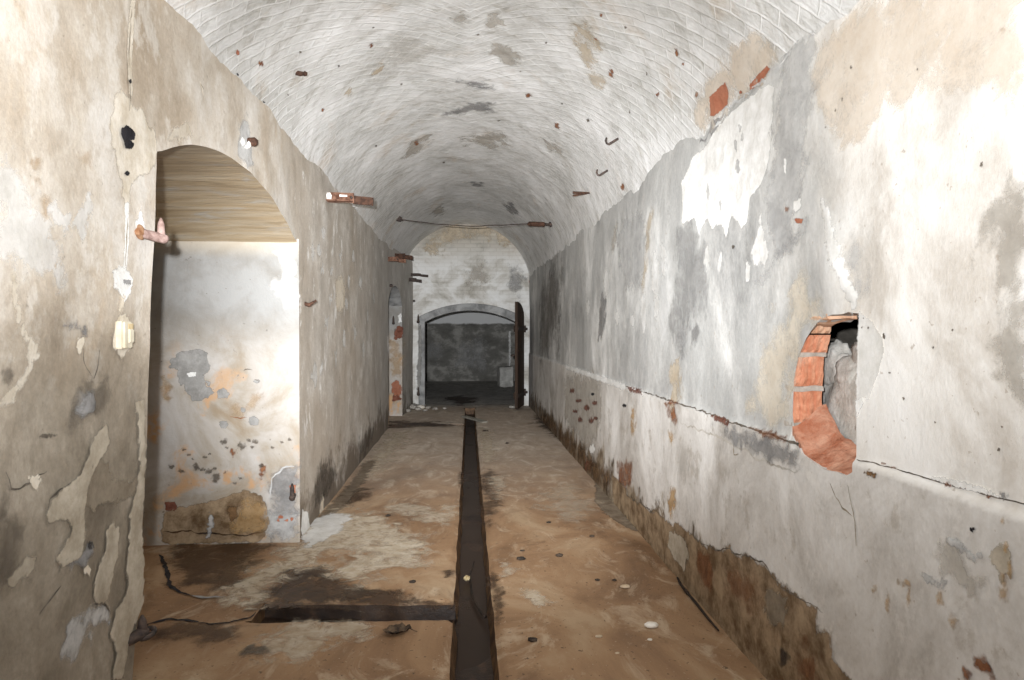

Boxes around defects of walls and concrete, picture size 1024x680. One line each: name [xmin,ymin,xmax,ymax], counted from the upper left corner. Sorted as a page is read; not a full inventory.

peeling [681,33,775,272]
flaking render [793,198,803,224]
spalling [809,317,869,347]
flaking render [169,349,229,401]
crack [566,365,799,473]
flaking render [6,471,47,490]
crack [857,459,1024,505]
flaking render [46,399,147,680]
damp [156,428,460,663]